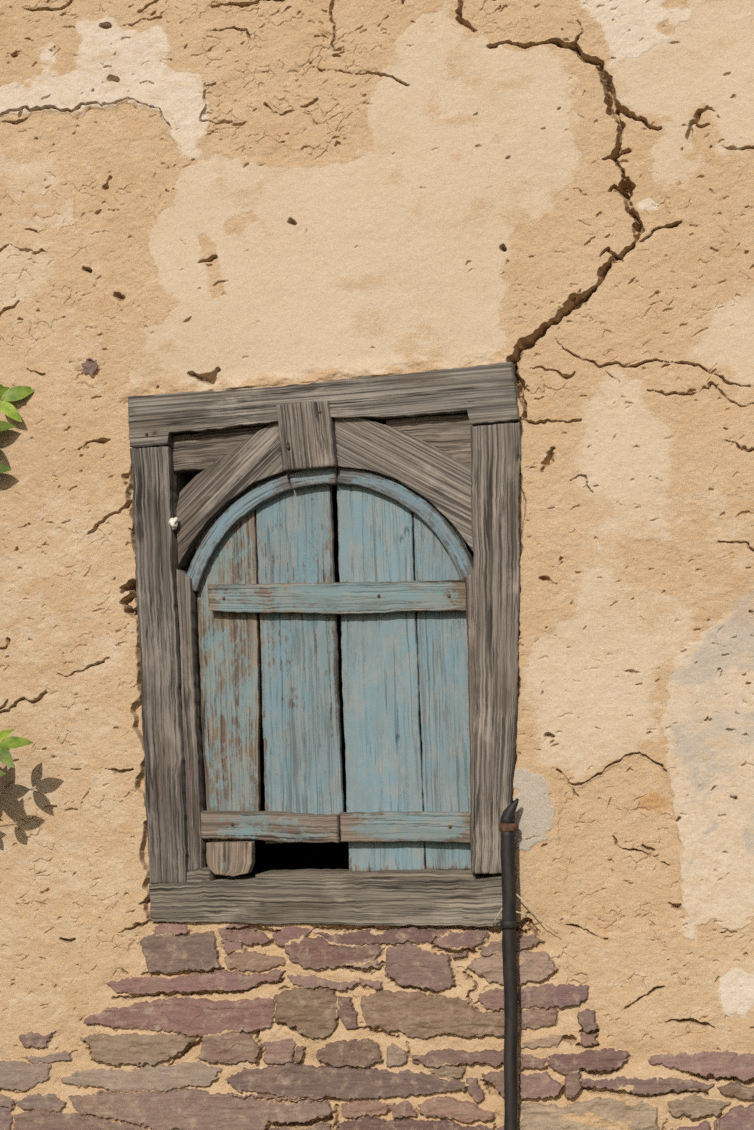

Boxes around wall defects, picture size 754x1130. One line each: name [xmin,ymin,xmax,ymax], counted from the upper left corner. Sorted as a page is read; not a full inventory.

crack [23,0,73,12]
crack [0,96,172,130]
crack [208,0,285,49]
crack [264,0,411,116]
flaking render [0,0,754,394]
crack [455,0,754,770]
crack [77,436,112,450]
crack [87,466,136,550]
crack [0,599,145,794]
flaking render [523,368,754,941]
crack [556,751,668,797]
crack [117,821,151,933]